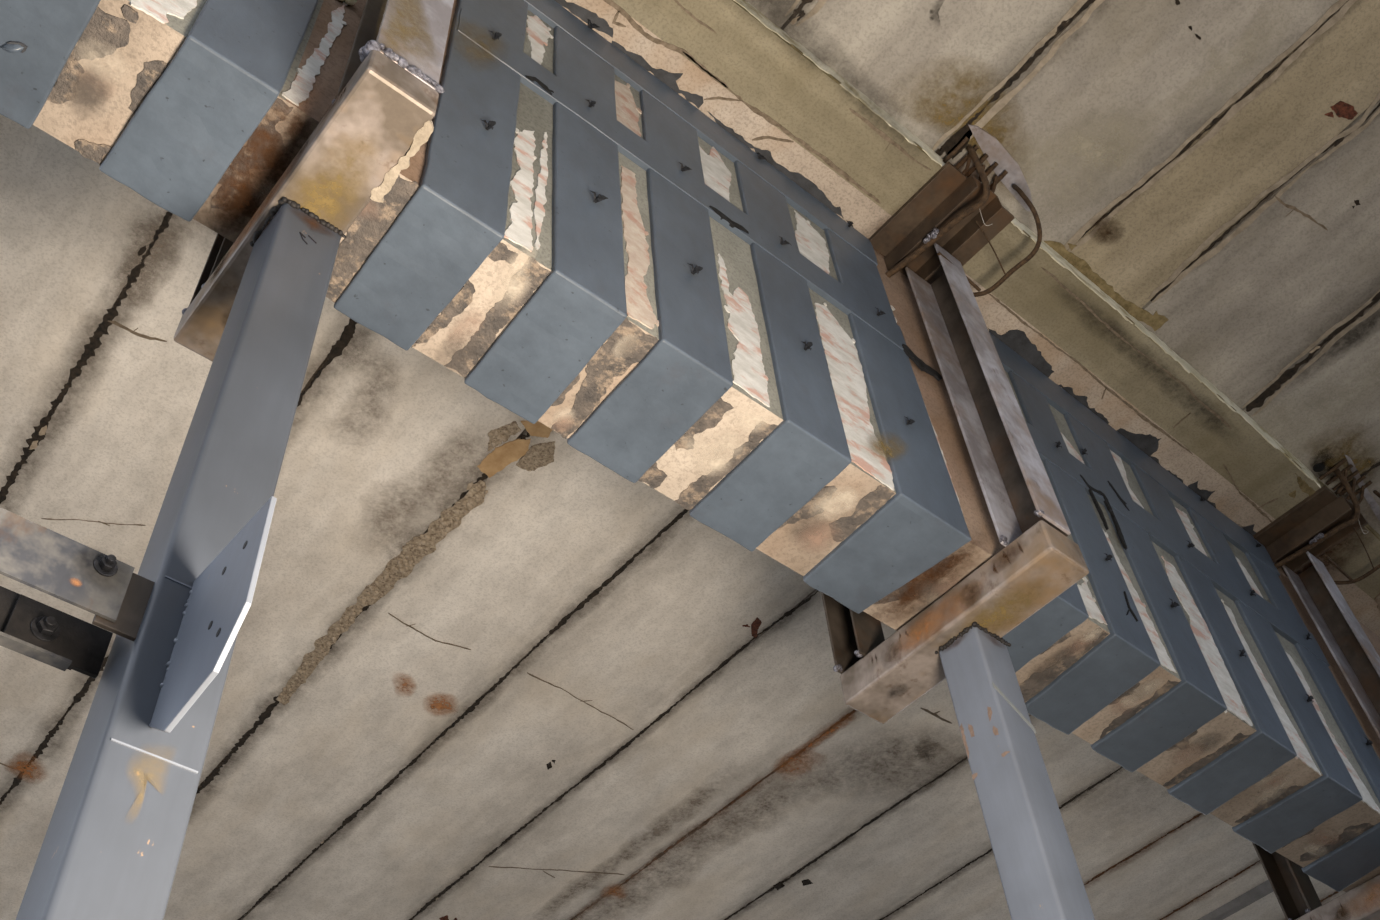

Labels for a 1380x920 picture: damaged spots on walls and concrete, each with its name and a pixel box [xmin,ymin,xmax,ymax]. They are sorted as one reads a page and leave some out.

spalling [211,1,348,211]
spalling [276,166,659,705]
crack [422,473,488,535]
crack [195,695,281,797]
rust [429,696,452,713]
crack [238,509,856,920]
water stain [550,790,710,908]
crack [724,757,967,920]
crack [879,848,992,920]
crack [921,708,952,724]
crack [1059,766,1123,809]